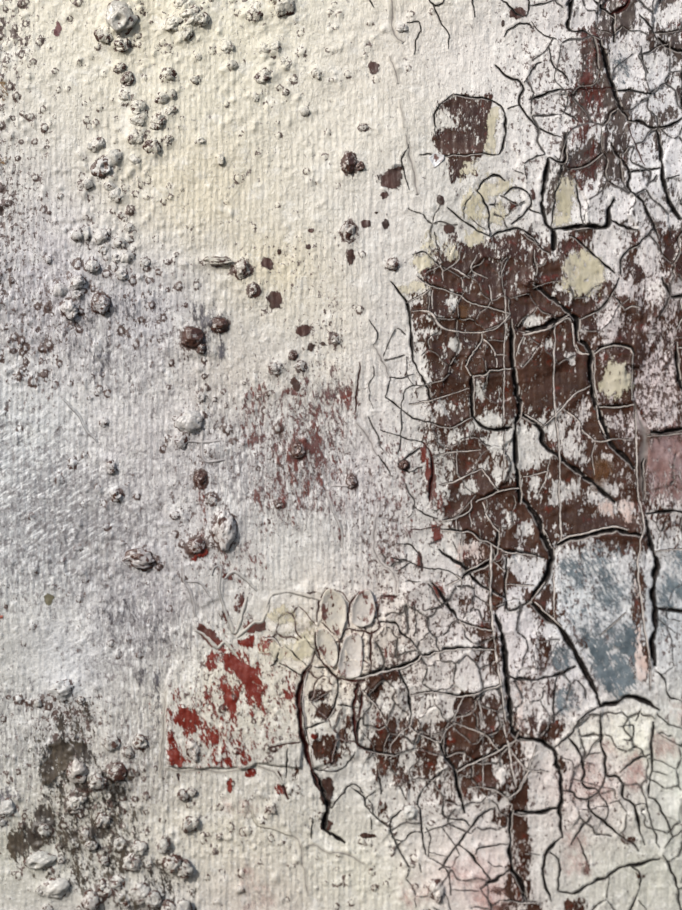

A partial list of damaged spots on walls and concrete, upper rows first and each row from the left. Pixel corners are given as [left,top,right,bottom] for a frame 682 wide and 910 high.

peeling [295,324,334,352]
crack [164,0,682,910]
peeling [305,0,682,910]